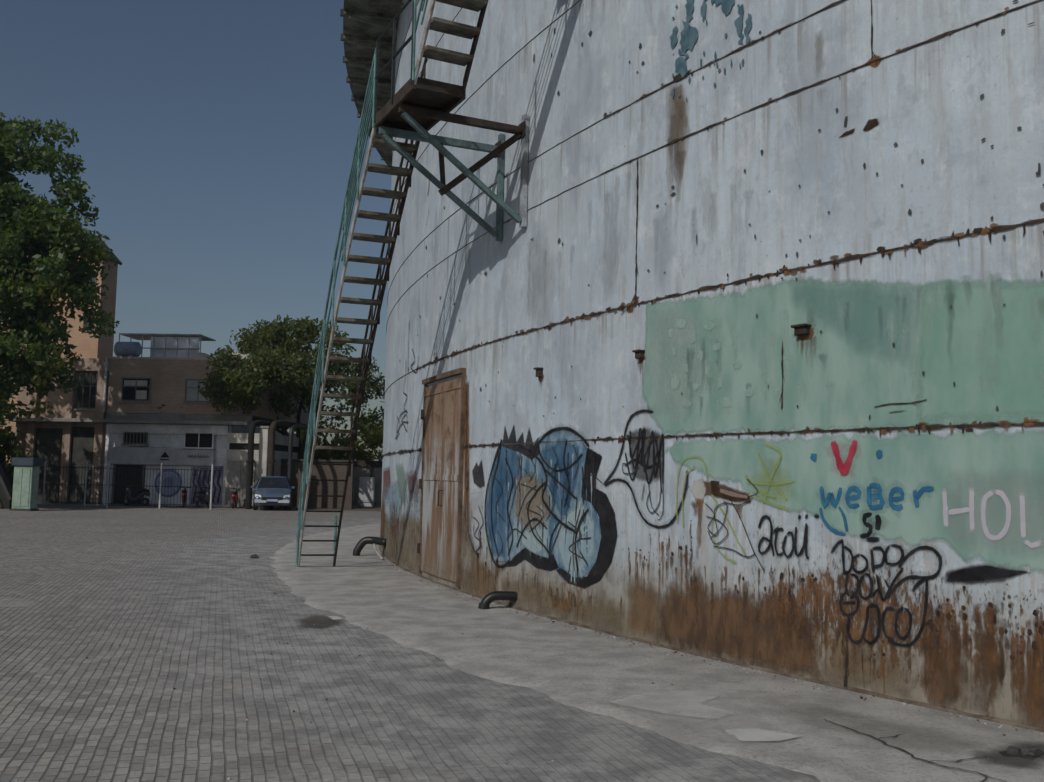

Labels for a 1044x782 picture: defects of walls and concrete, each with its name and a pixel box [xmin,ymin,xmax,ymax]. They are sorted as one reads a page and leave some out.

peeling [670,0,761,103]
leakage [668,70,690,169]
rust [416,218,1044,371]
rust [380,490,421,569]
spalling [691,479,750,543]
rust [460,376,1044,724]
crack [825,719,1007,782]